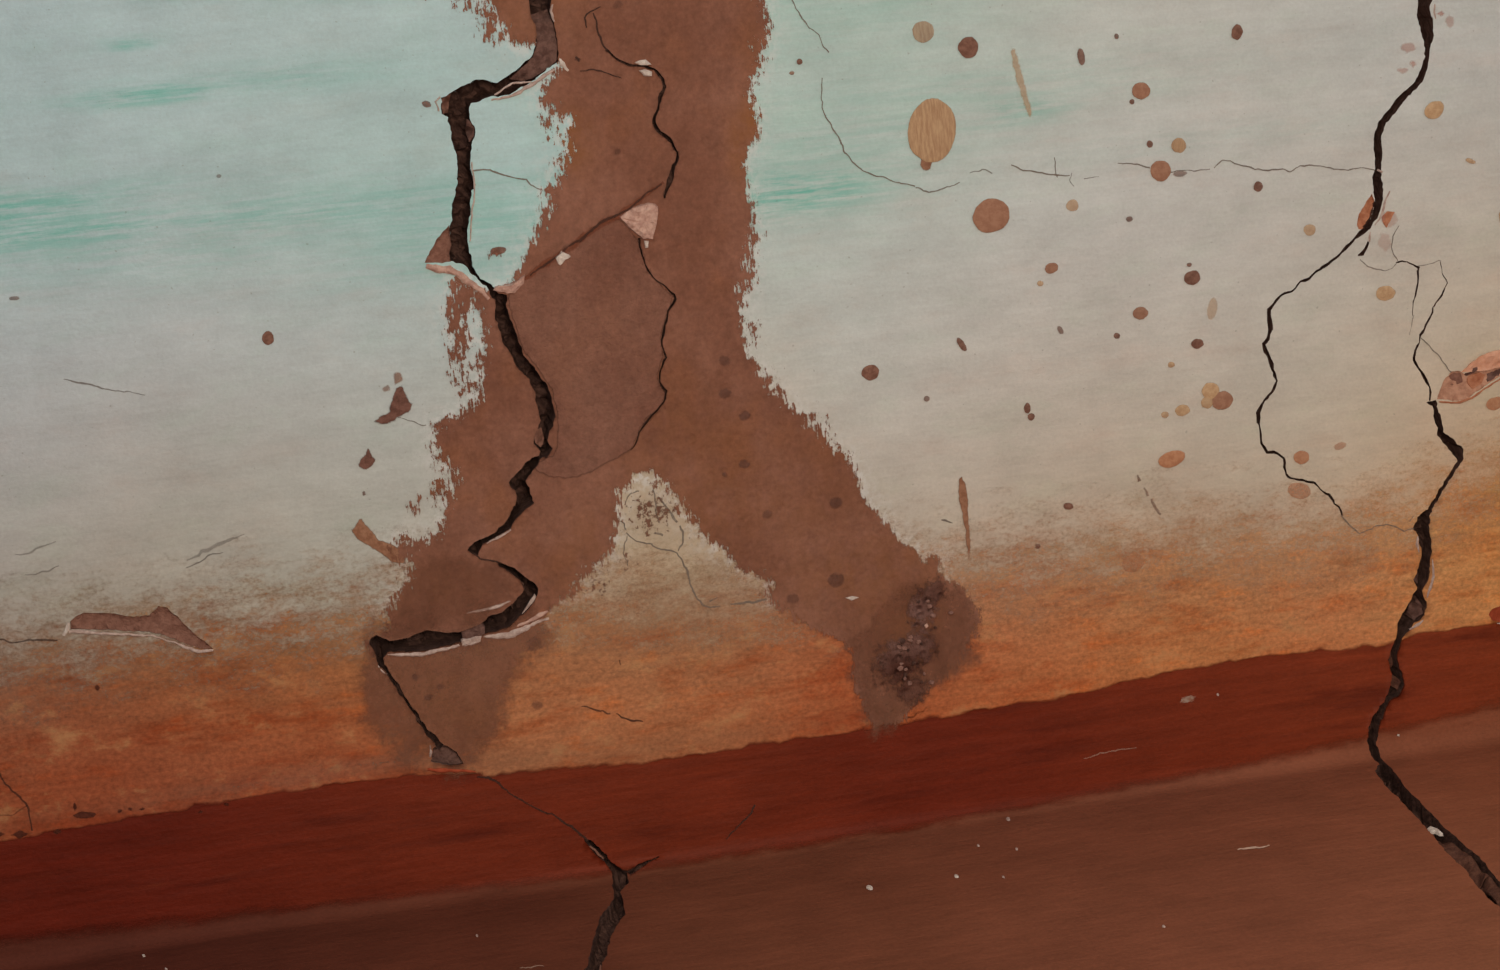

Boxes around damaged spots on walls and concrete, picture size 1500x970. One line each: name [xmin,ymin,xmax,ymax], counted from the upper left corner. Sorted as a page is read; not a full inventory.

crack [792,0,1070,193]
peeling [0,606,213,653]
crack [369,0,679,970]
rust [0,470,1500,841]
crack [1118,0,1500,906]
peeling [1437,350,1500,404]